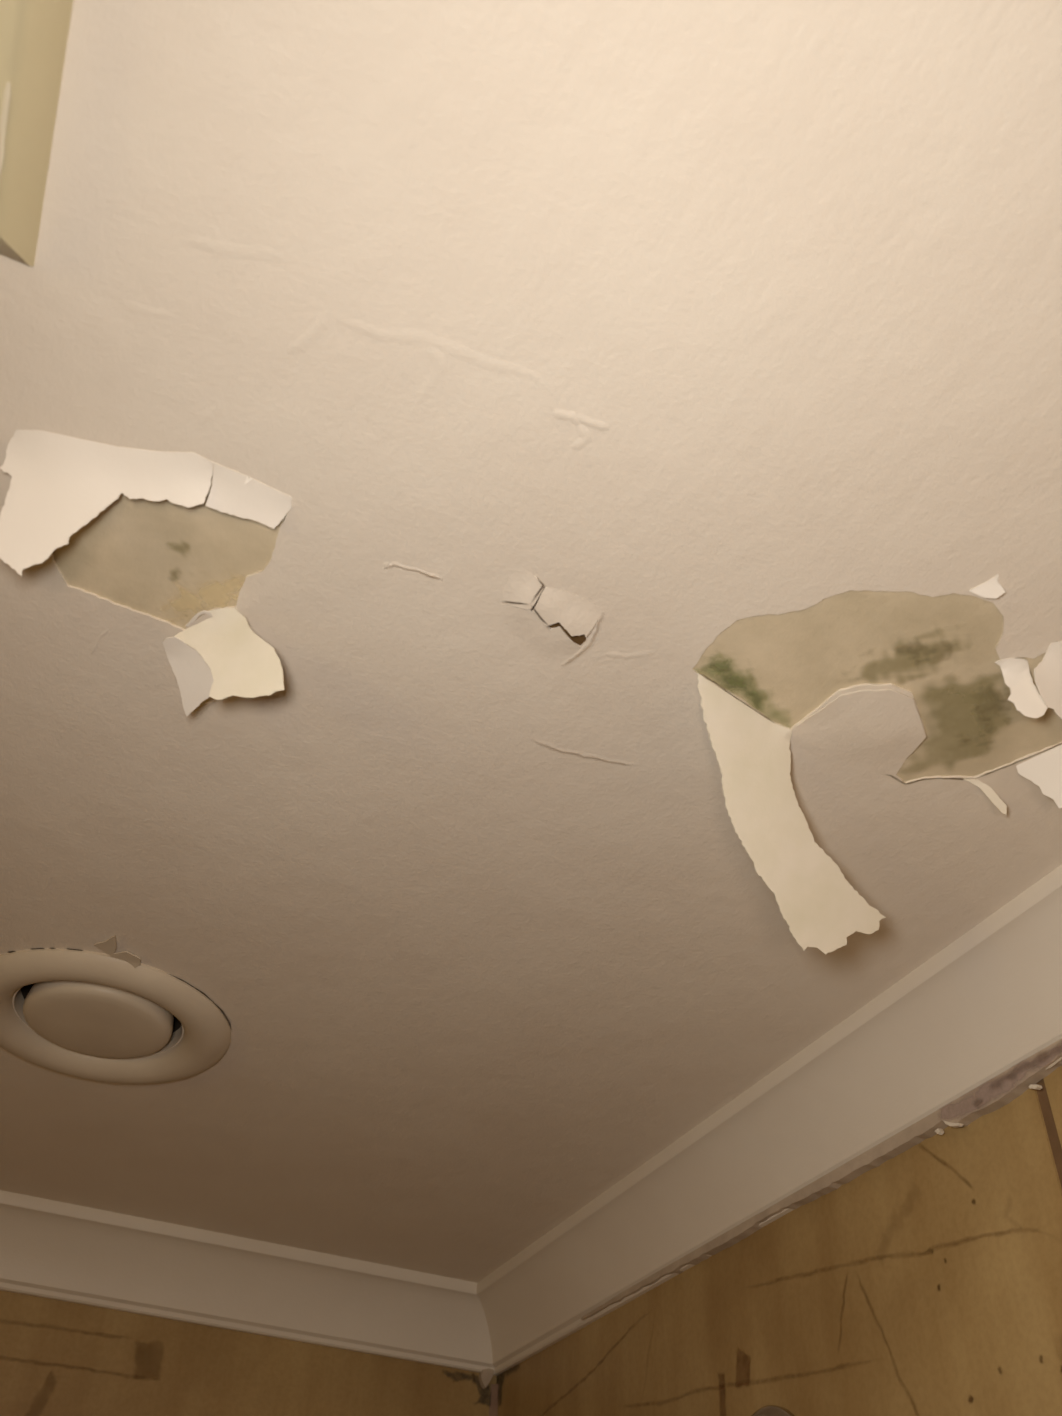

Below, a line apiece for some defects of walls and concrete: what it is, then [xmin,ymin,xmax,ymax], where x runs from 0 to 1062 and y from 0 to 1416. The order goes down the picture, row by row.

peeling [0,430,292,716]
peeling [693,575,1062,954]